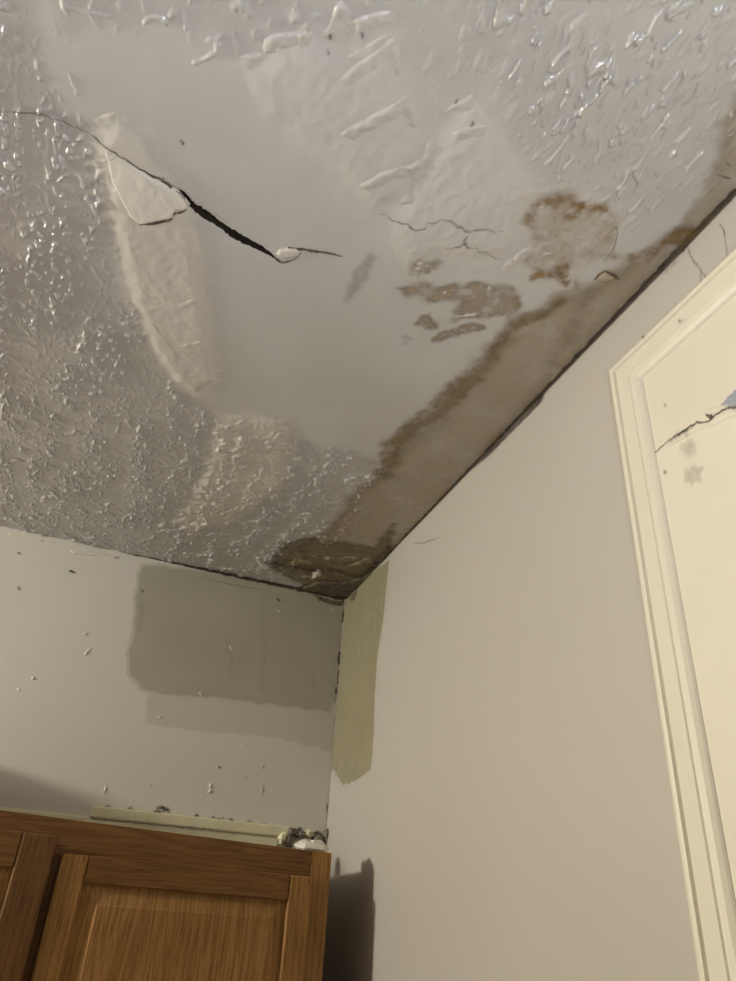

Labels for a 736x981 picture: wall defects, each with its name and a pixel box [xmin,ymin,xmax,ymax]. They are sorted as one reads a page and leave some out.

crack [92,135,343,264]
crack [71,189,736,621]
damp [256,263,654,597]